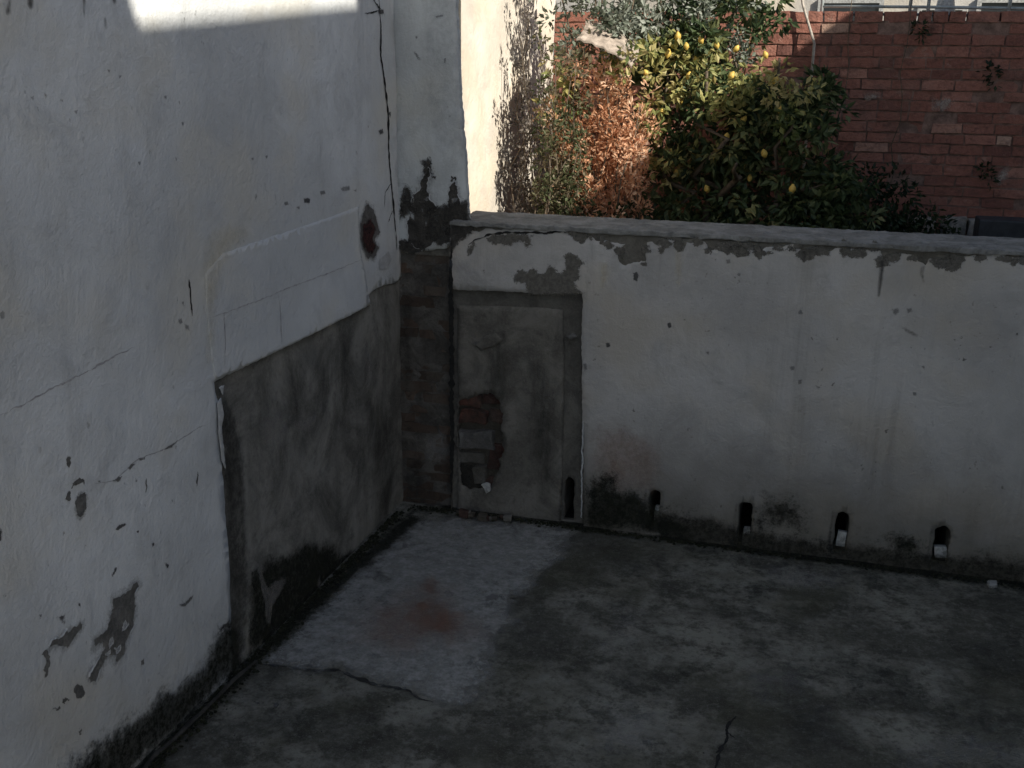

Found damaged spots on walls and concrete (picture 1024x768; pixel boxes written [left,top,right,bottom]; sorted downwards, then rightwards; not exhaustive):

crack [367,0,397,246]
spalling [360,158,474,270]
peeling [513,231,626,296]
peeling [633,237,1024,281]
crack [1,347,134,415]
crack [97,425,205,484]
damp [222,402,247,652]
damp [654,509,1024,584]
peeling [42,615,82,677]
peeling [53,582,139,711]
crack [262,664,432,702]
crack [714,716,736,768]